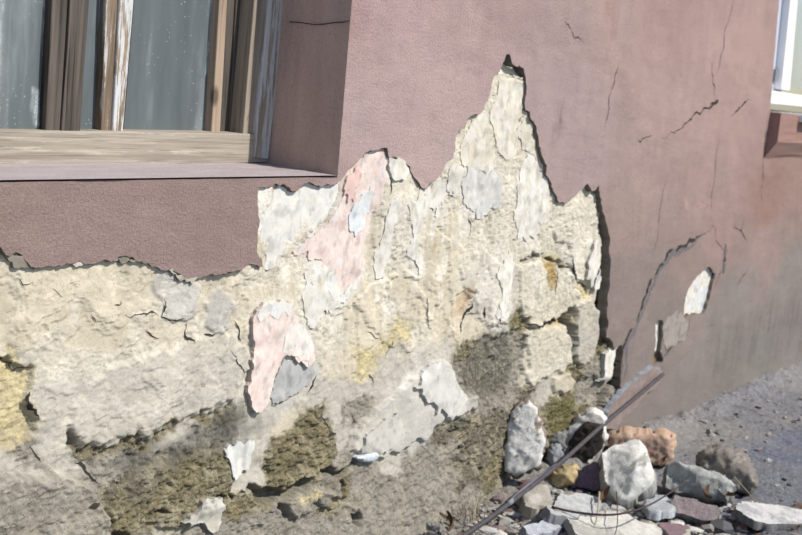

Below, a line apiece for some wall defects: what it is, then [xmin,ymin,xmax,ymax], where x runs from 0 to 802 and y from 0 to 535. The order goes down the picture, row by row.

crack [289,18,350,26]
crack [639,10,732,143]
flaking render [0,64,618,535]
crack [611,141,746,381]
spalling [684,267,711,315]